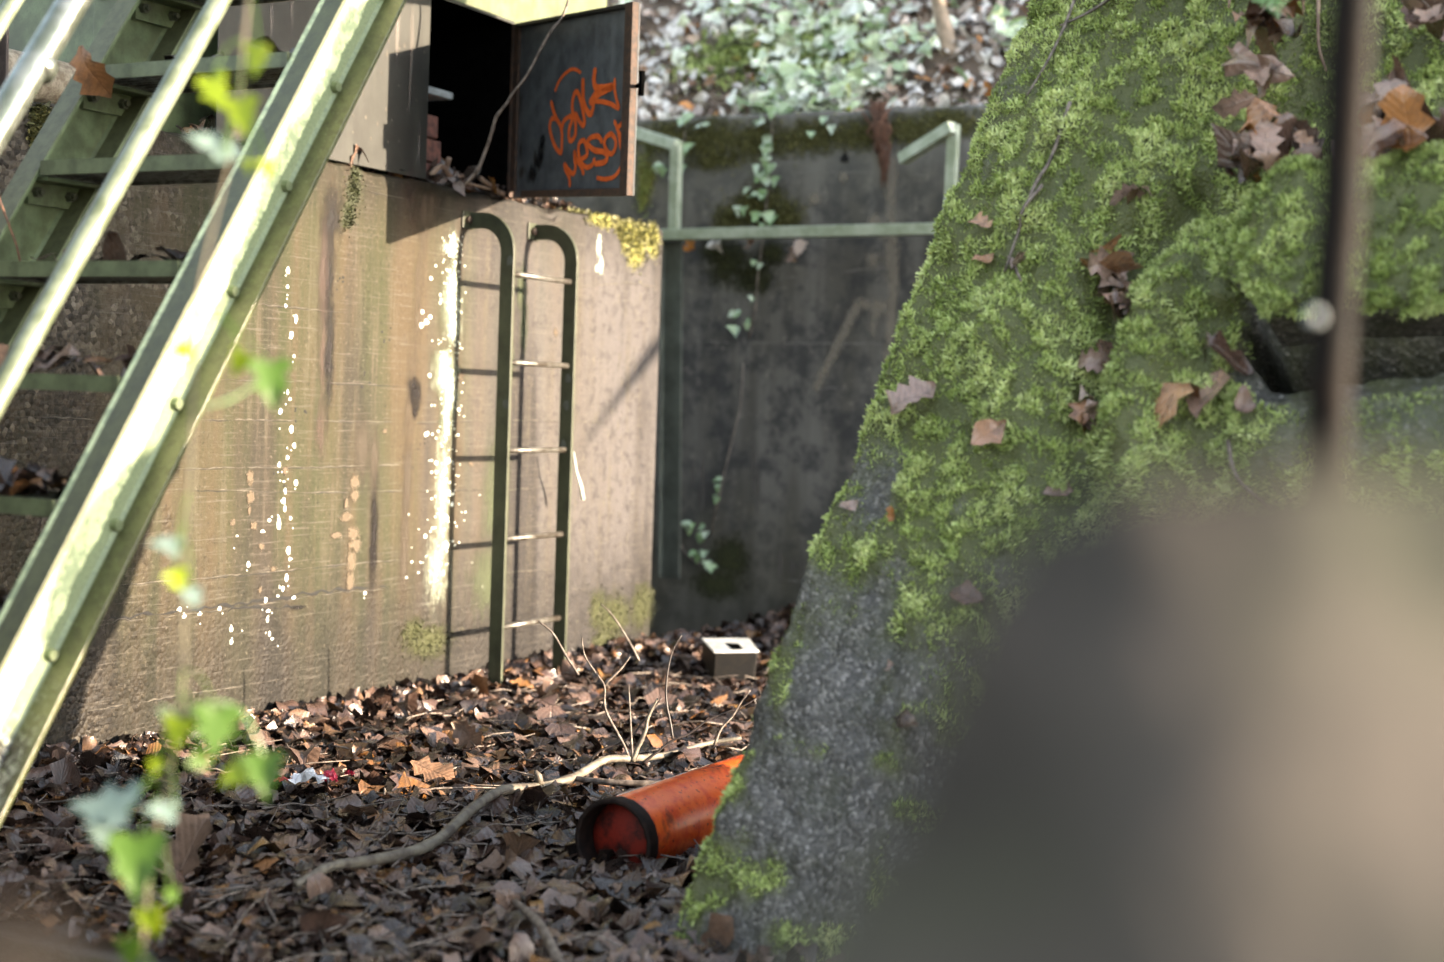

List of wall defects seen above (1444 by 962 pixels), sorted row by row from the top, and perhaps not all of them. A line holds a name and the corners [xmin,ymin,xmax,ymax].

efflorescence [260,389,298,533]
damp [356,425,378,574]
damp [401,234,466,589]
damp [479,447,495,532]
efflorescence [262,546,296,647]
damp [472,552,491,605]